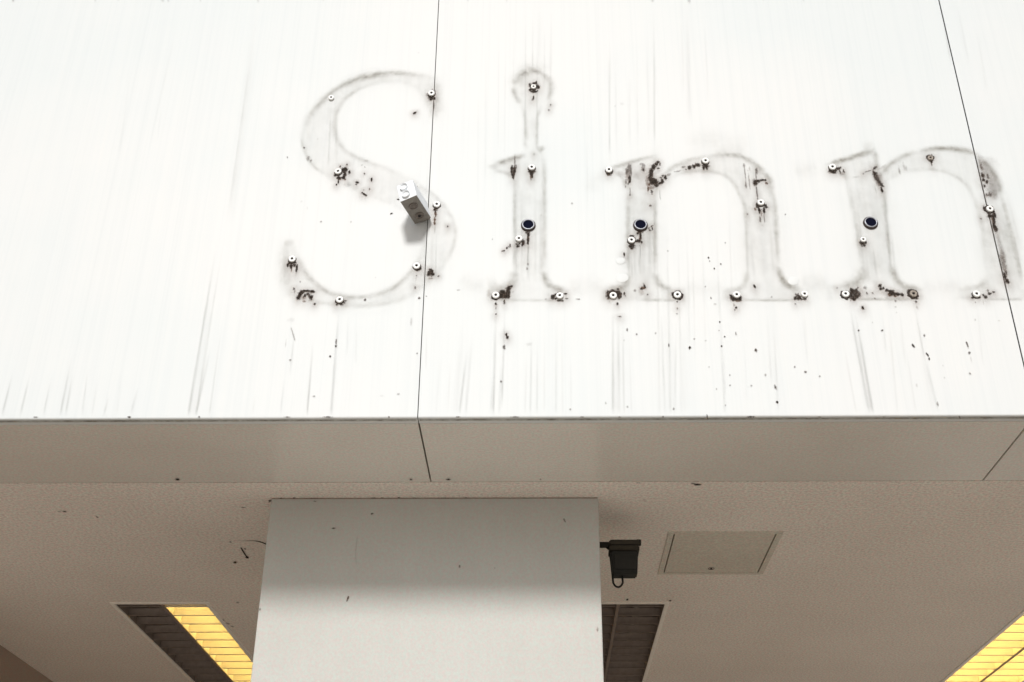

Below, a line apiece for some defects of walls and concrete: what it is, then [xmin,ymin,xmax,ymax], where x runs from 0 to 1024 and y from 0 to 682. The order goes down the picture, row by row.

corrosion [626,161,667,206]
corrosion [745,169,768,221]
corrosion [980,167,998,231]
corrosion [491,285,513,305]
corrosion [850,284,918,309]